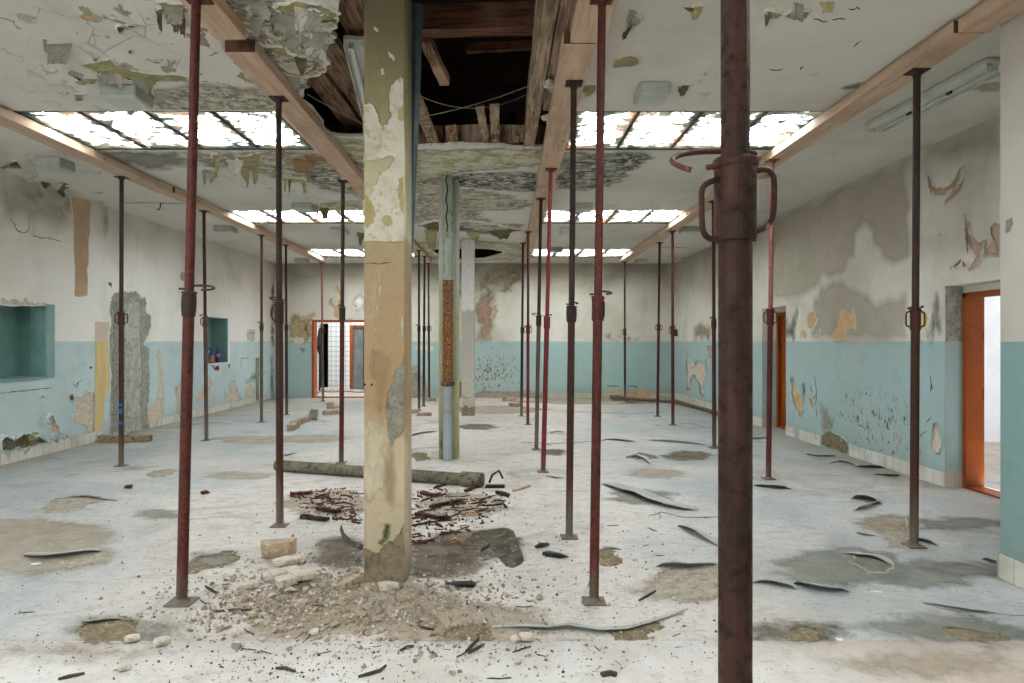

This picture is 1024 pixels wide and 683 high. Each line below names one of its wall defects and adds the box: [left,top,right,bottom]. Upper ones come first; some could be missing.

peeling [154,0,190,38]
peeling [763,2,835,27]
peeling [43,39,189,105]
peeling [356,49,439,251]
water stain [555,152,651,190]
water stain [414,147,542,338]
peeling [459,220,524,241]
peeling [949,213,1000,272]
spalling [108,282,181,435]
spalling [0,389,95,457]
spalling [385,345,434,449]
peeling [821,386,944,457]